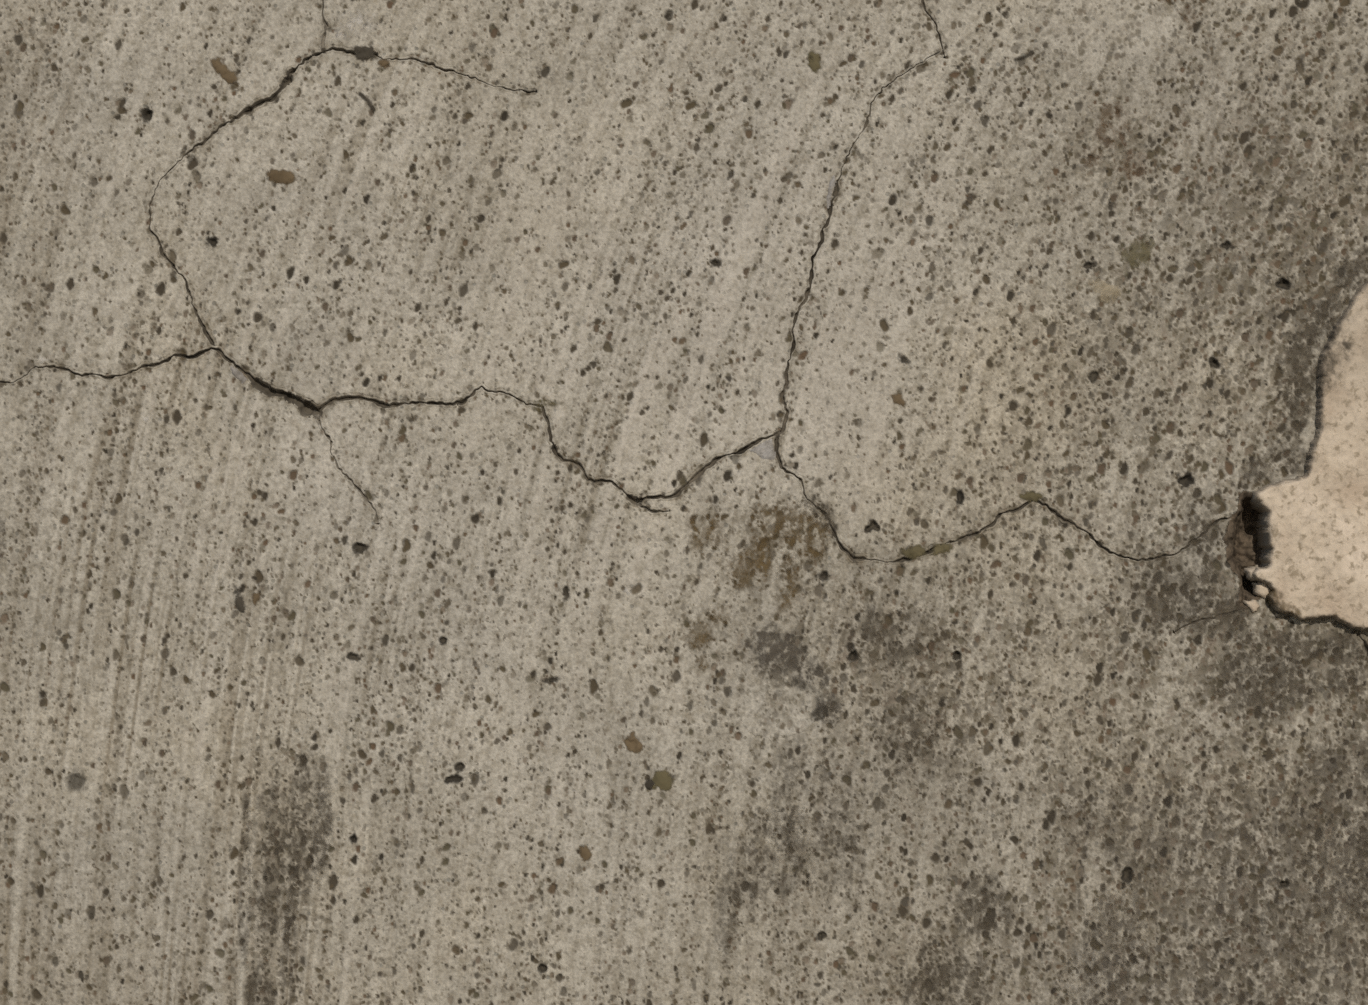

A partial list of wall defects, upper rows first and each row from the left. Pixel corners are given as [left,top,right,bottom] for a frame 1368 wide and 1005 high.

crack [0,0,1232,565]
spalling [1276,278,1290,289]
peeling [1243,565,1270,613]